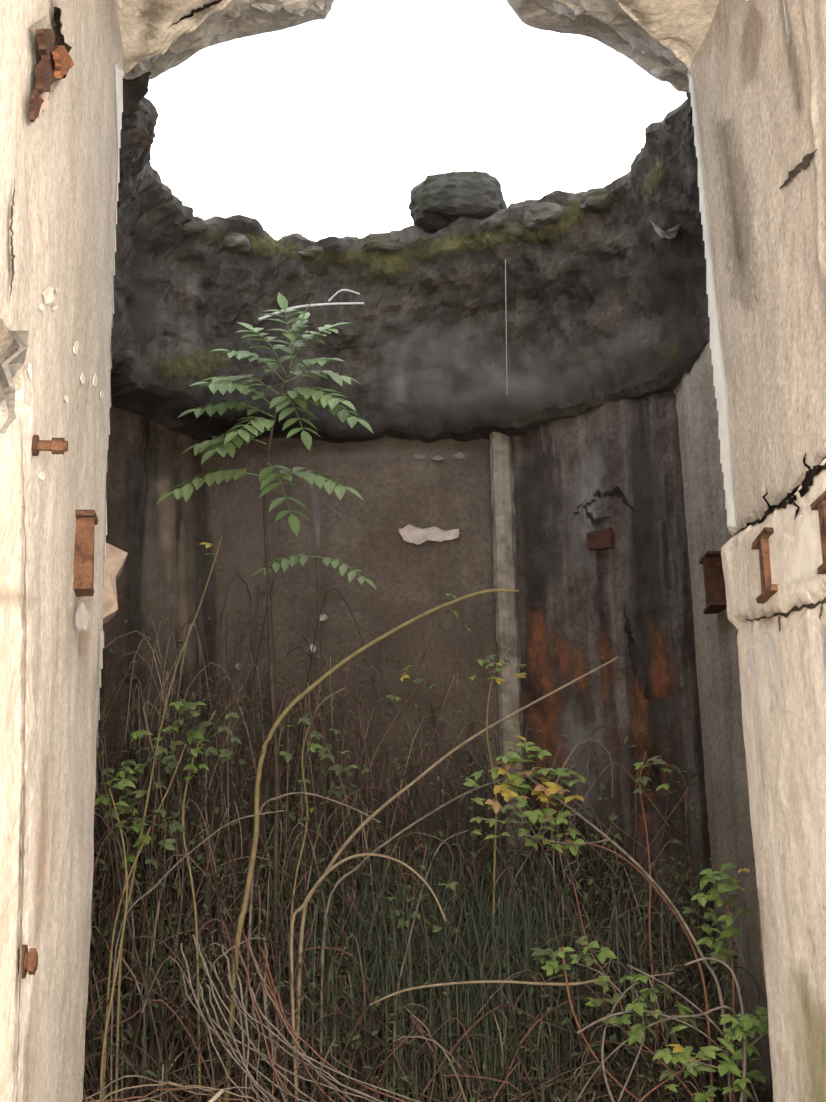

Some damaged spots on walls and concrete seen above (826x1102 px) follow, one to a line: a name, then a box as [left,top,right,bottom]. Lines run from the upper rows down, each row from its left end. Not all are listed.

leakage [141,0,168,39]
crack [169,0,222,28]
crack [734,453,826,535]
peeling [399,524,459,545]
crack [742,597,826,632]
corrosion [526,612,613,834]
corrosion [615,623,675,838]